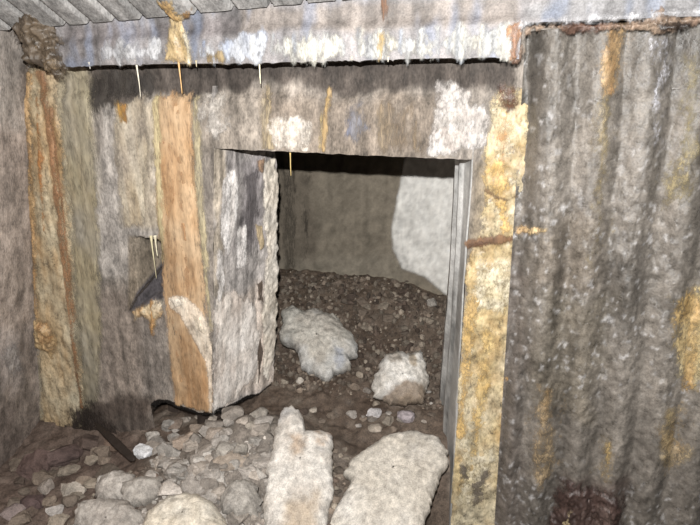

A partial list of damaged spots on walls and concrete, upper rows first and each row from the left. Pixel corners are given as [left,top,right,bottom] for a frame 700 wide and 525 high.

water stain [199,22,513,65]
rust [506,7,700,94]
rust [319,87,332,152]
rust [152,93,213,413]
rust [672,287,700,390]